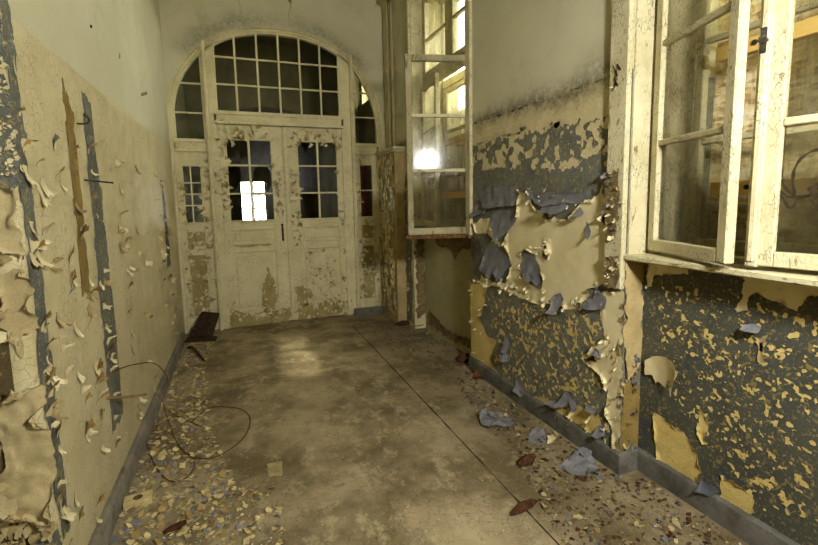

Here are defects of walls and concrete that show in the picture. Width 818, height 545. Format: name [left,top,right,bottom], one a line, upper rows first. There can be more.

peeling [118,119,268,334]
peeling [217,73,818,522]